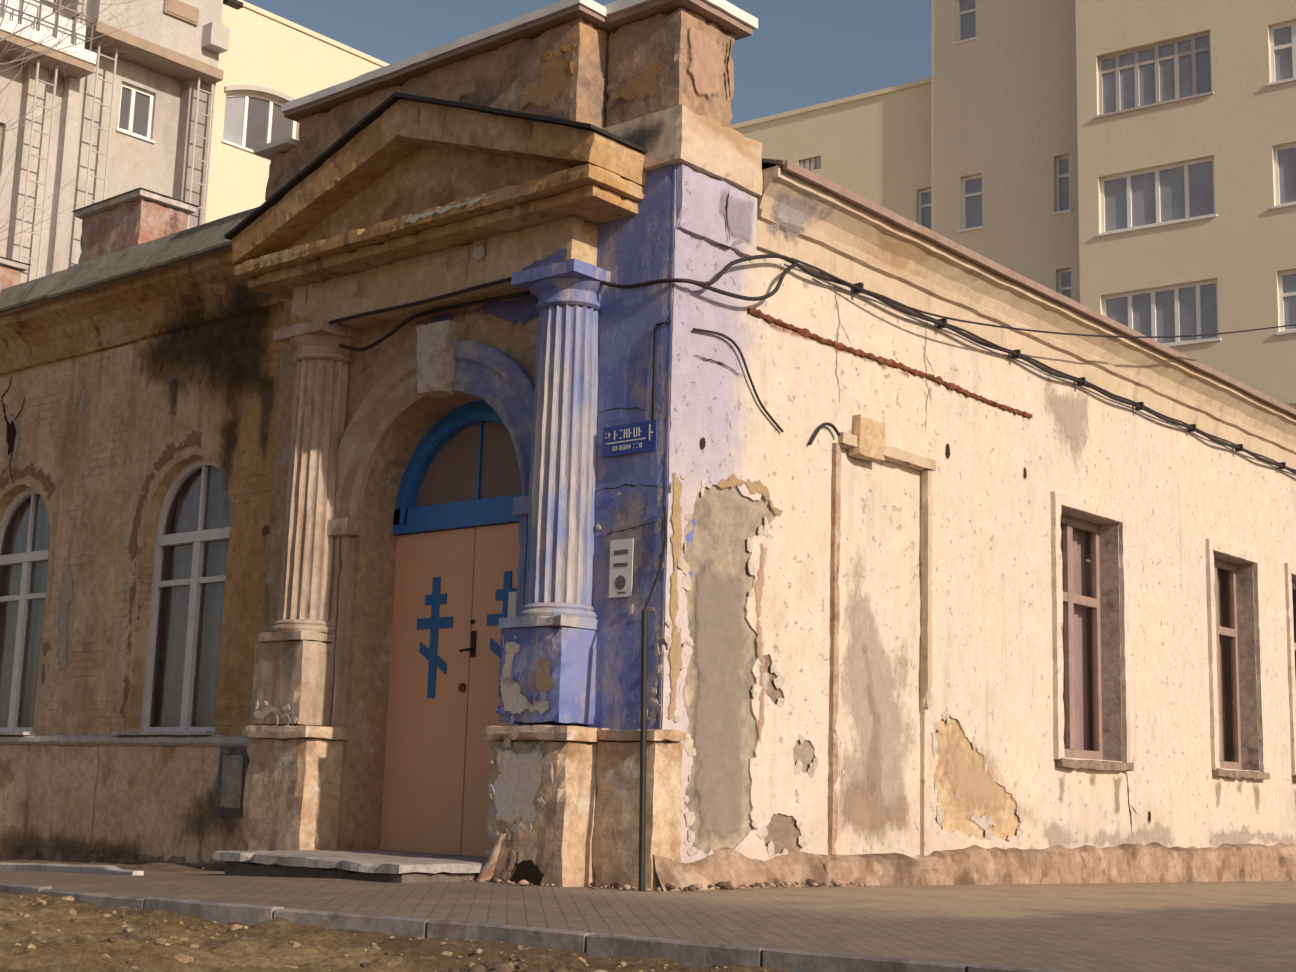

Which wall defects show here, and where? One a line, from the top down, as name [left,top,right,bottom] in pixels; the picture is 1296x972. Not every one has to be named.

spalling [520,44,576,110]
spalling [689,26,731,98]
crack [0,376,26,484]
water stain [142,281,273,505]
spalling [595,473,809,859]
peeling [476,635,554,886]
spalling [931,707,1024,846]